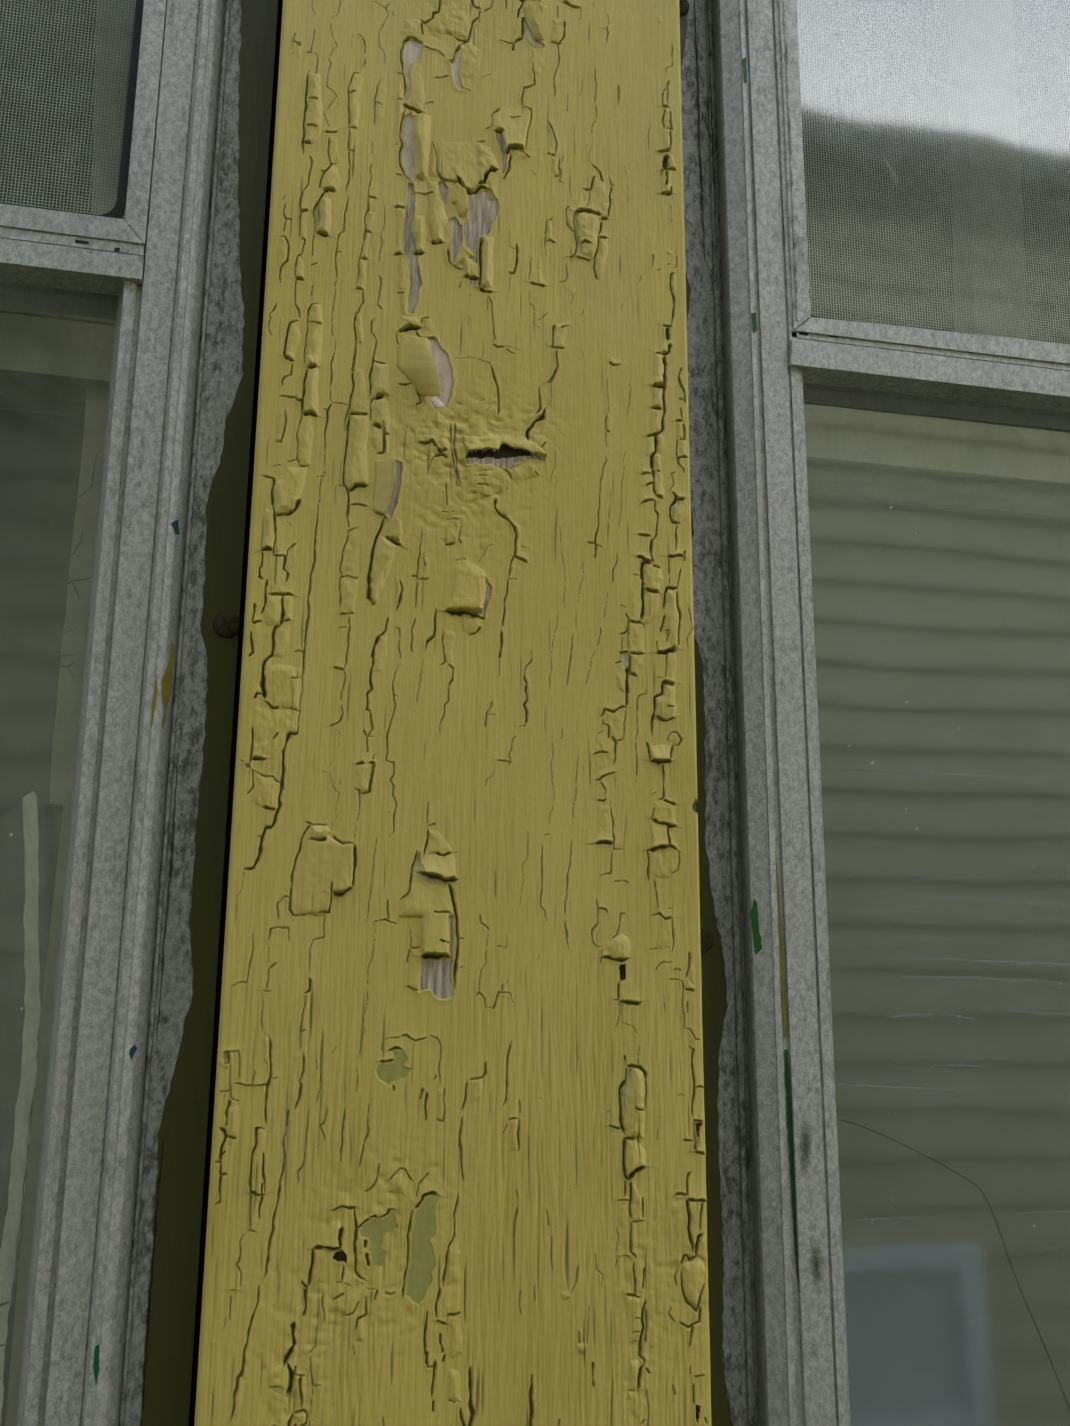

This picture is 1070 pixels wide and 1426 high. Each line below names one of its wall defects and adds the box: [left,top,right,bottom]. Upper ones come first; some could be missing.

peeling [563,173,617,263]
peeling [332,0,568,606]
crack [619,249,679,311]
peeling [442,561,492,638]
crack [211,0,652,1426]
peeling [398,799,469,999]
crack [654,948,703,1042]
peeling [604,1043,708,1426]
crack [687,1337,710,1426]